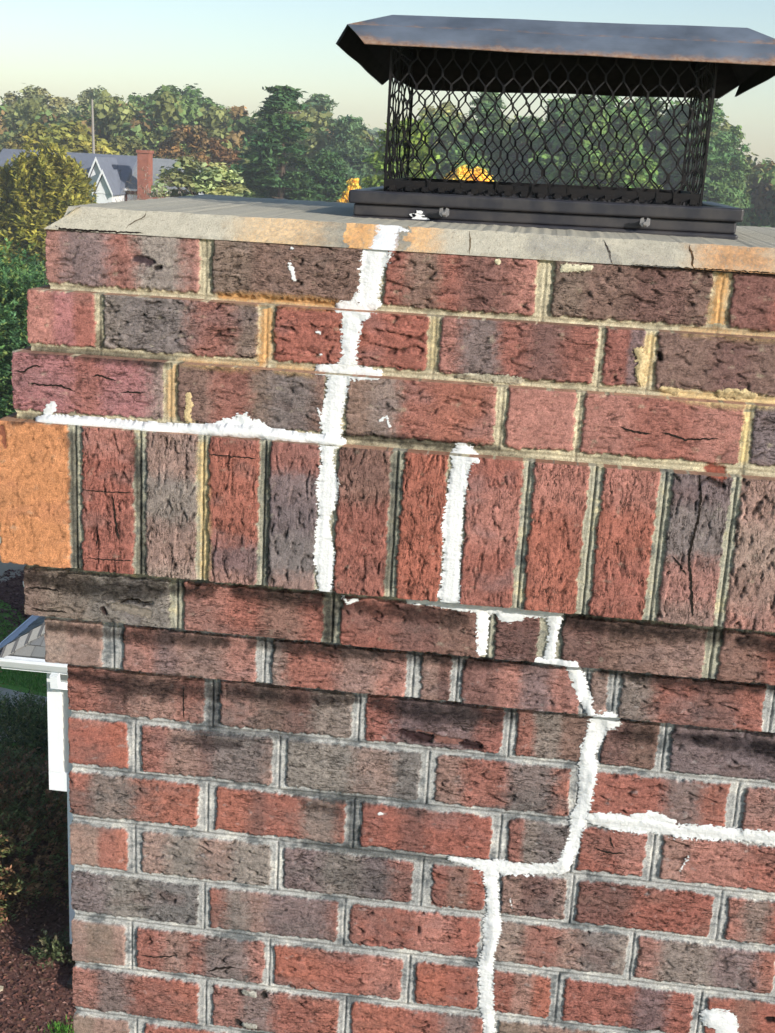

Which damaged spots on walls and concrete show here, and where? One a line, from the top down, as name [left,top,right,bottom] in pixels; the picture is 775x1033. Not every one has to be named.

crack [55,213,146,234]
crack [17,365,144,394]
crack [209,452,257,460]
crack [82,489,133,561]
crack [673,477,702,616]
crack [26,587,66,613]
crack [596,837,624,854]